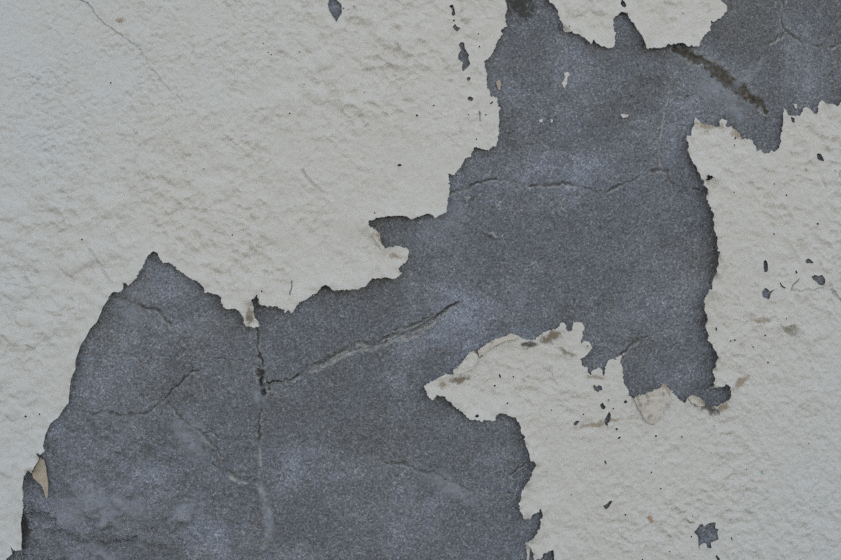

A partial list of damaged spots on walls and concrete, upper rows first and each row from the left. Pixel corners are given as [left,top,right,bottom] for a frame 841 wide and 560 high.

crack [76,0,184,103]
peeling [458,45,471,81]
peeling [669,0,783,117]
crack [448,85,702,198]
peeling [367,222,409,279]
peeling [217,290,263,328]
peeling [424,373,451,401]
crack [73,293,465,557]
peeling [32,458,48,498]
spalling [22,503,66,531]
spalling [6,521,179,560]
peeling [527,535,555,560]